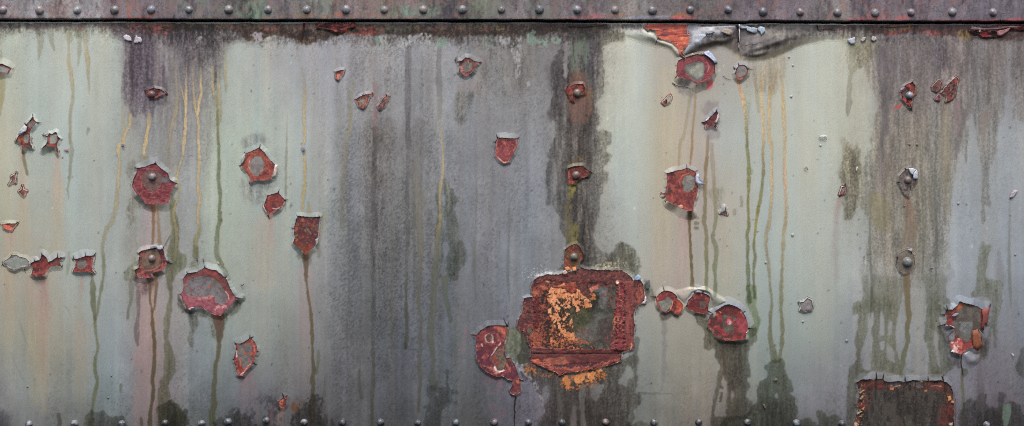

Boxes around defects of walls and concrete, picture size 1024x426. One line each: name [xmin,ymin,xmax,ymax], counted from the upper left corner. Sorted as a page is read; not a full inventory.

peeling [643,15,718,107]
peeling [1,249,97,281]
peeling [129,156,180,212]
peeling [177,257,245,321]
peeling [238,143,323,261]
damp [0,0,660,426]
corrosion [515,62,693,393]
peeling [471,241,752,398]
peeling [659,164,705,220]
damp [630,0,1024,426]
peeling [937,295,992,373]
corrosion [852,379,956,426]